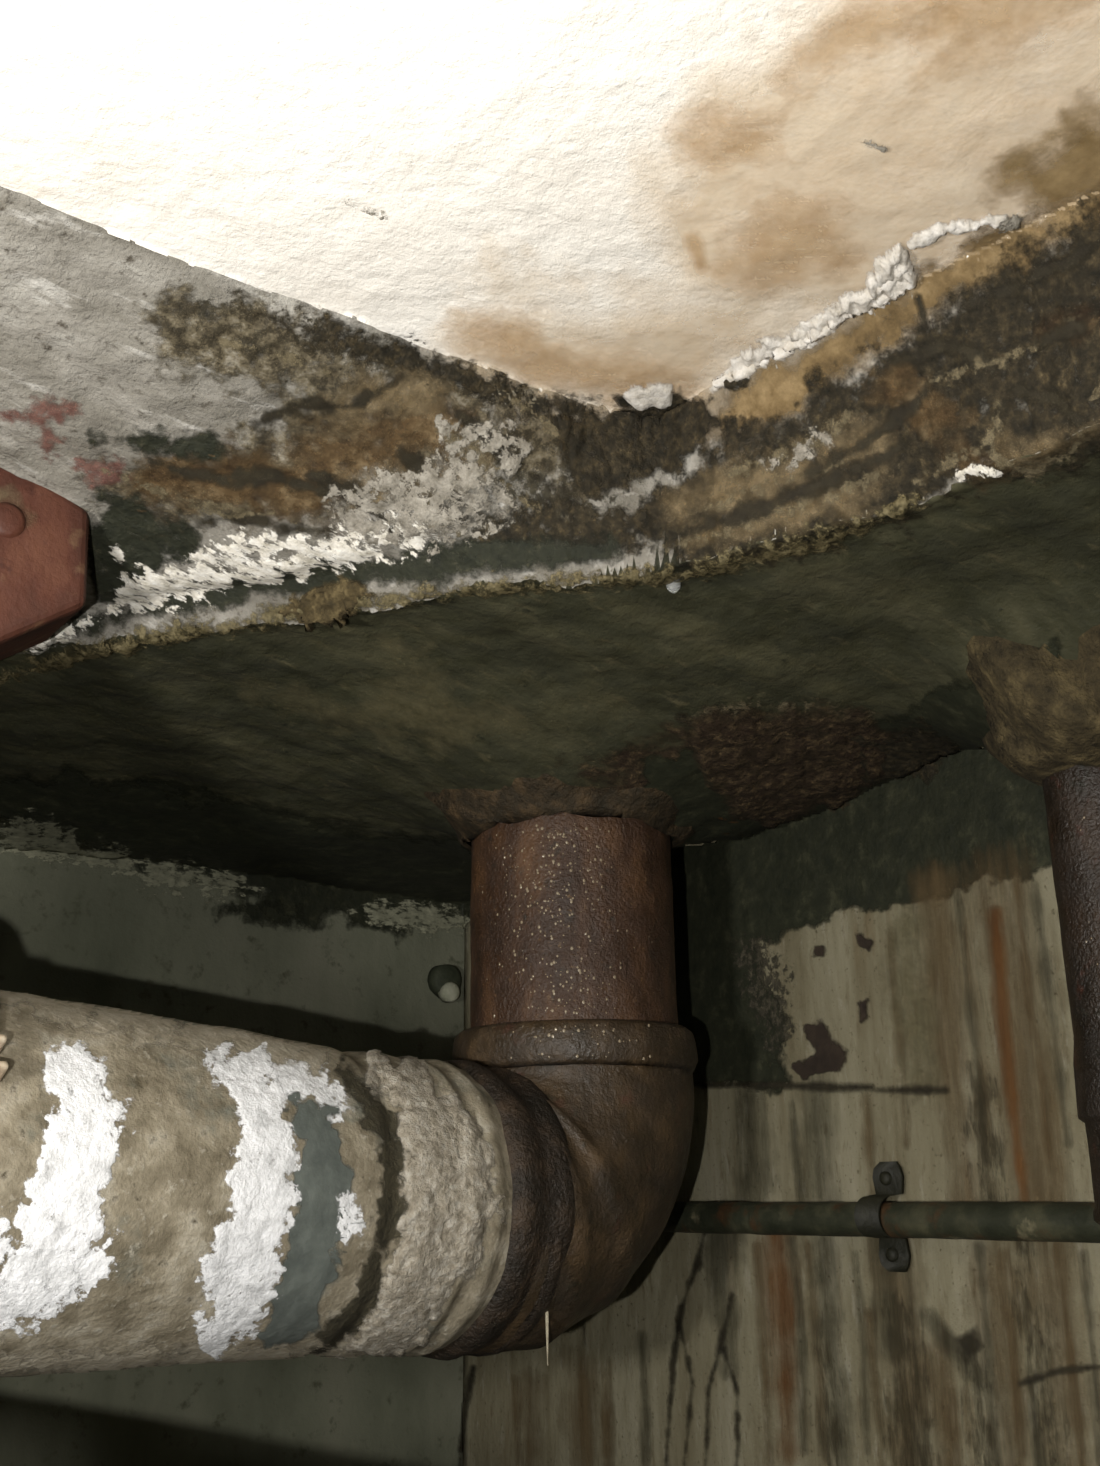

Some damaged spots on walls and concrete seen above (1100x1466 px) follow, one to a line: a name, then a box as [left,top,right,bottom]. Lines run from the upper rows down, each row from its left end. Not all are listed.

water stain [0,113,1100,685]
water stain [641,680,1052,1202]
crack [665,1233,740,1463]
water stain [932,1317,992,1466]